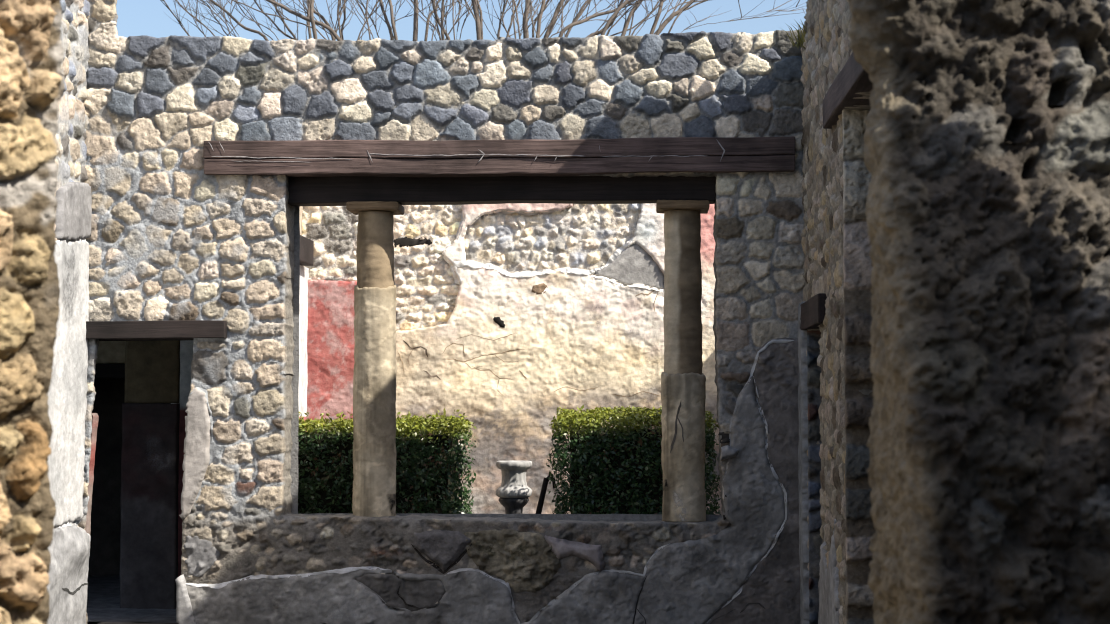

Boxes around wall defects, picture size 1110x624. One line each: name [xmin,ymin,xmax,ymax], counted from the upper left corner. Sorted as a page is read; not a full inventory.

peeling [302,206,358,281]
peeling [393,204,664,331]
crack [397,334,527,393]
crack [554,386,684,453]